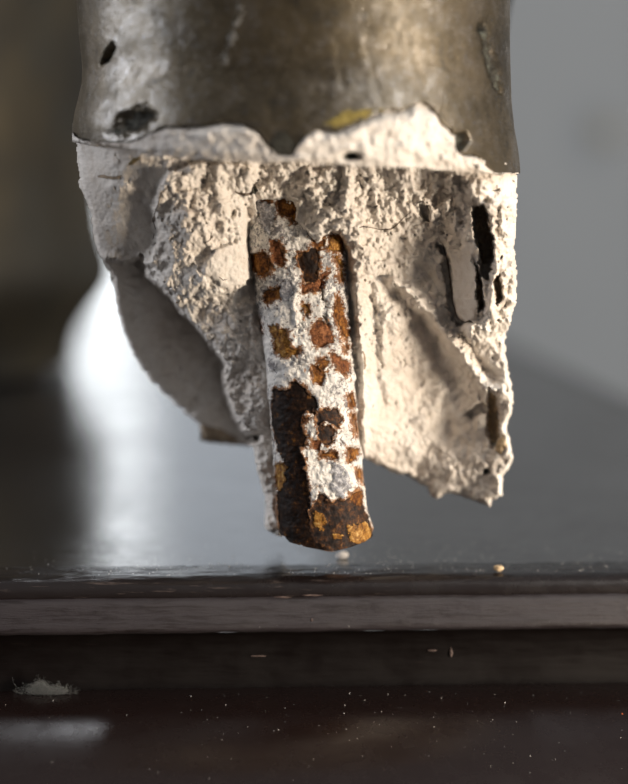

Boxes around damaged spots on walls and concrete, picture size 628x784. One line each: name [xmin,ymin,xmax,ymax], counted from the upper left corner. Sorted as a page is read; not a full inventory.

spalling [269,131,296,156]
corrosion [259,199,298,223]
corrosion [250,240,286,276]
peeling [298,247,319,283]
spalling [474,205,492,310]
spalling [493,276,502,302]
corrosion [259,317,299,358]
corrosion [310,297,353,386]
spalling [486,391,500,444]
peeling [270,382,373,551]
corrosion [309,439,366,506]
corrosion [313,511,372,544]